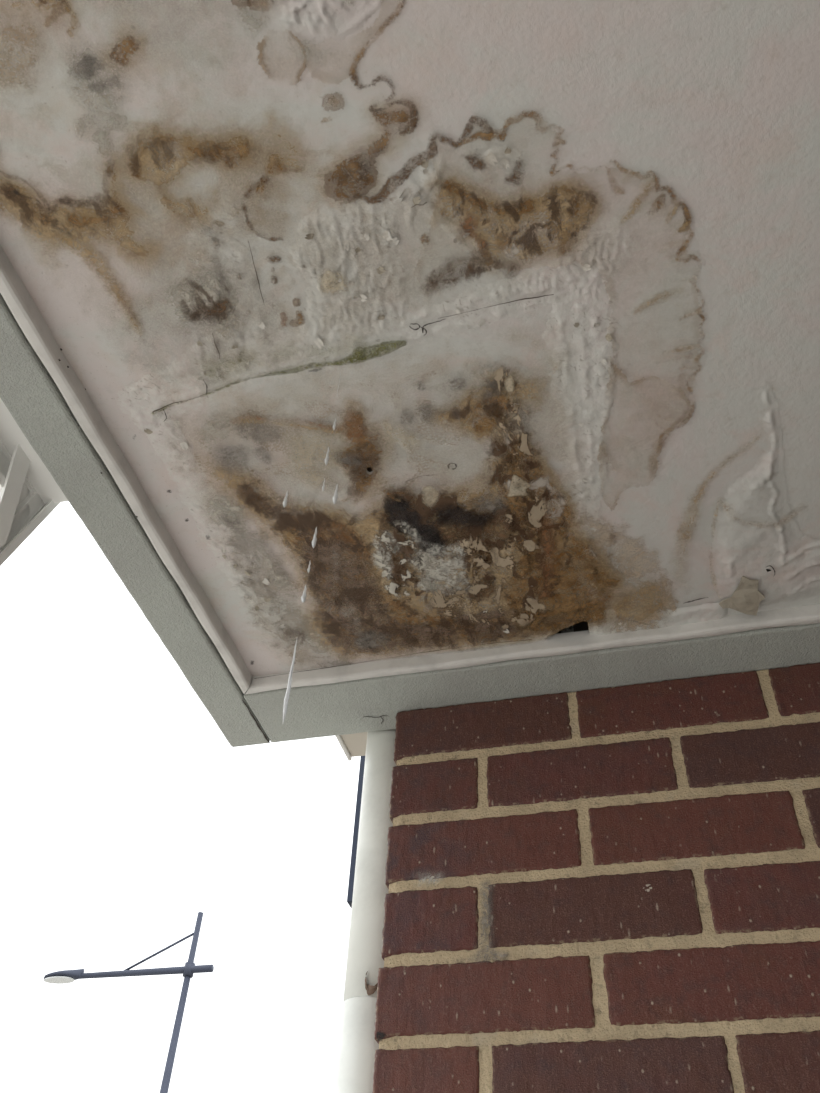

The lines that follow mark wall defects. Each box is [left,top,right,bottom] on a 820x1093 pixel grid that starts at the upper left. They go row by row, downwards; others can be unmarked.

water stain [0,166,151,329]
water stain [72,35,139,155]
water stain [128,132,252,218]
water stain [171,275,239,337]
water stain [257,39,268,74]
water stain [242,134,298,241]
water stain [324,49,538,204]
water stain [426,141,594,290]
water stain [625,171,698,262]
crack [153,333,246,421]
water stain [202,367,678,665]
peeling [373,393,556,634]